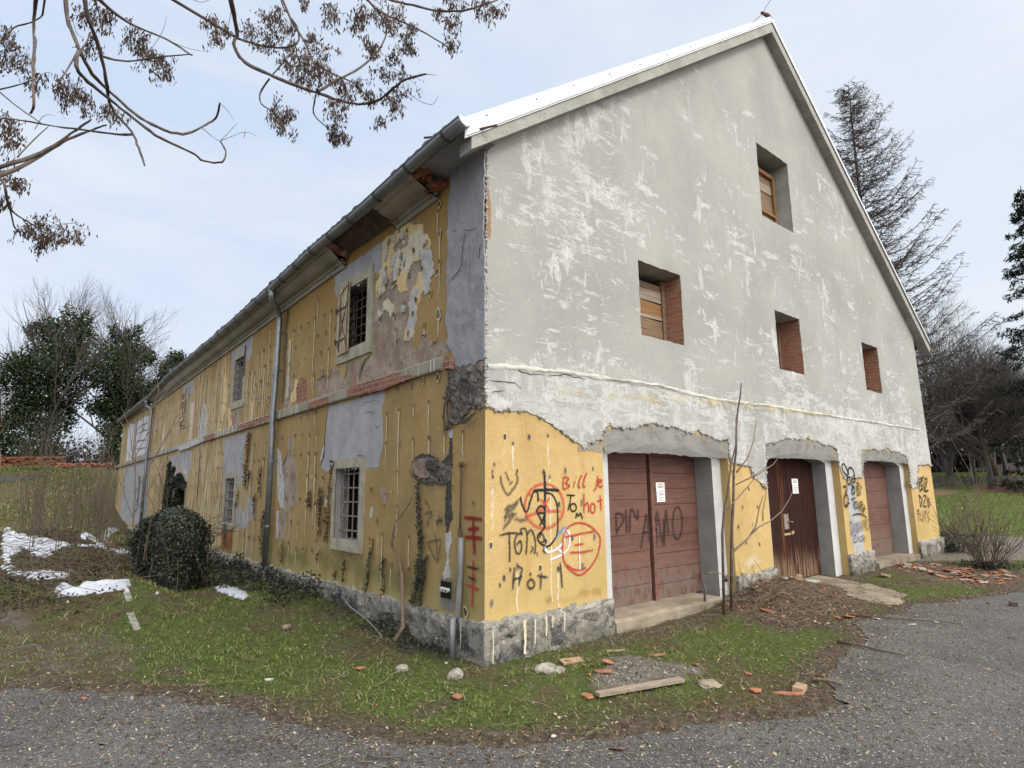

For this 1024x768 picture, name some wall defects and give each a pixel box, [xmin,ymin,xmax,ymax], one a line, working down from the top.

water stain [191,356,268,556]
water stain [282,312,296,414]
peeling [236,199,487,586]
crack [448,226,481,305]